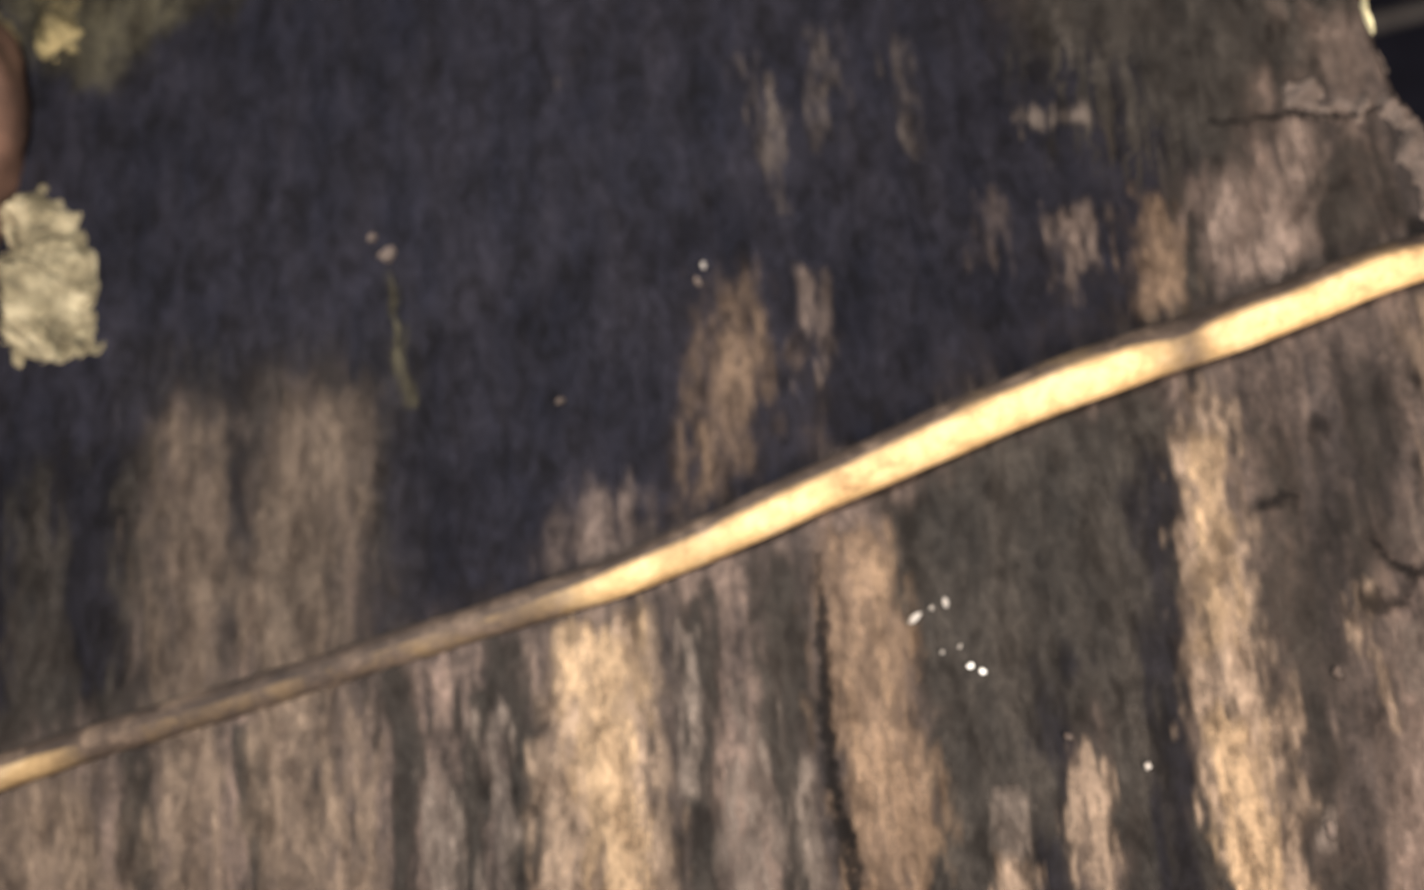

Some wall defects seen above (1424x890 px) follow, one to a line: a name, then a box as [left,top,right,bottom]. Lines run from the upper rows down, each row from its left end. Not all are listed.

crack [1210,100,1400,125]
crack [1258,492,1297,509]
crack [1377,544,1424,614]